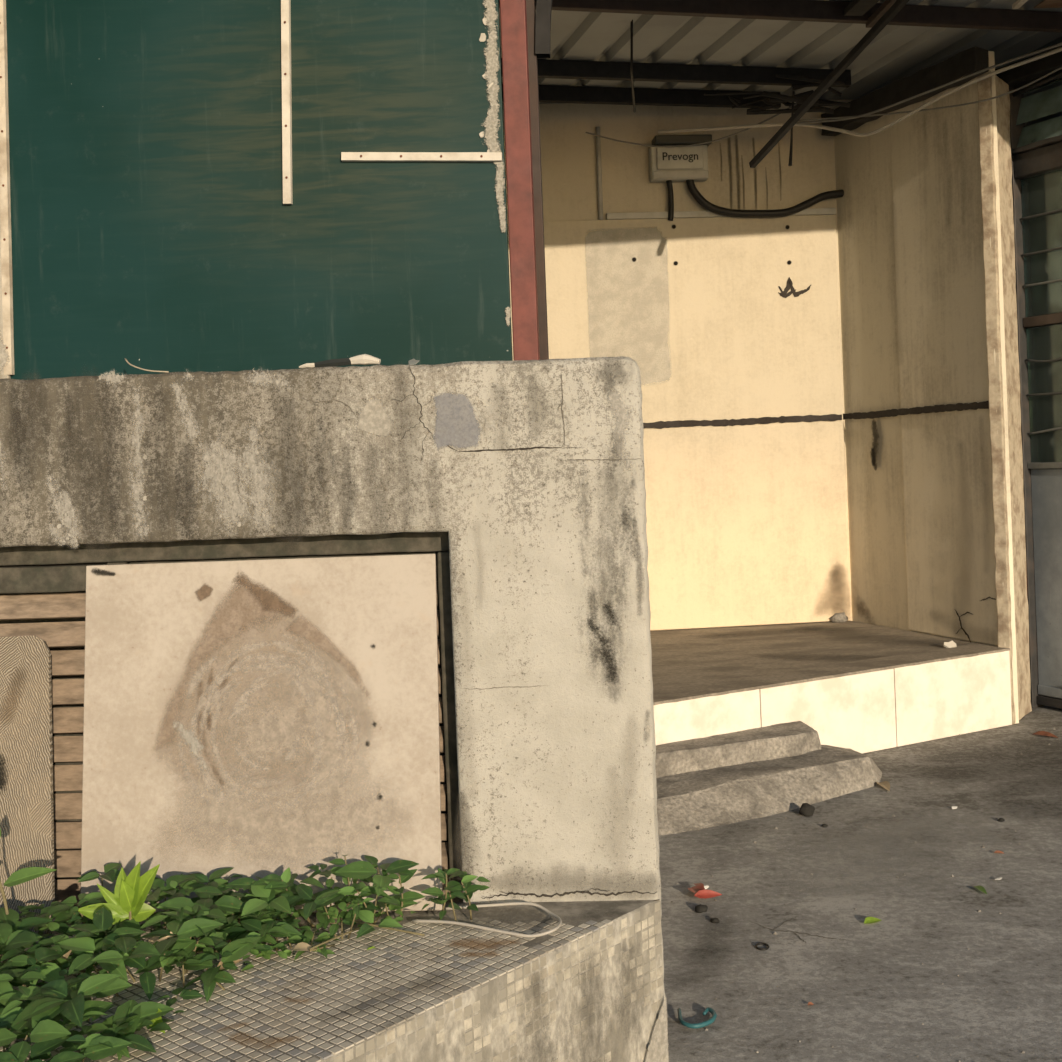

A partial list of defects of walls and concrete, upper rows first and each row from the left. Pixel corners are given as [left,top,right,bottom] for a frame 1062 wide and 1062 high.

peeling [479,0,506,232]
crack [393,362,641,463]
crack [955,596,996,642]
crack [481,888,656,899]